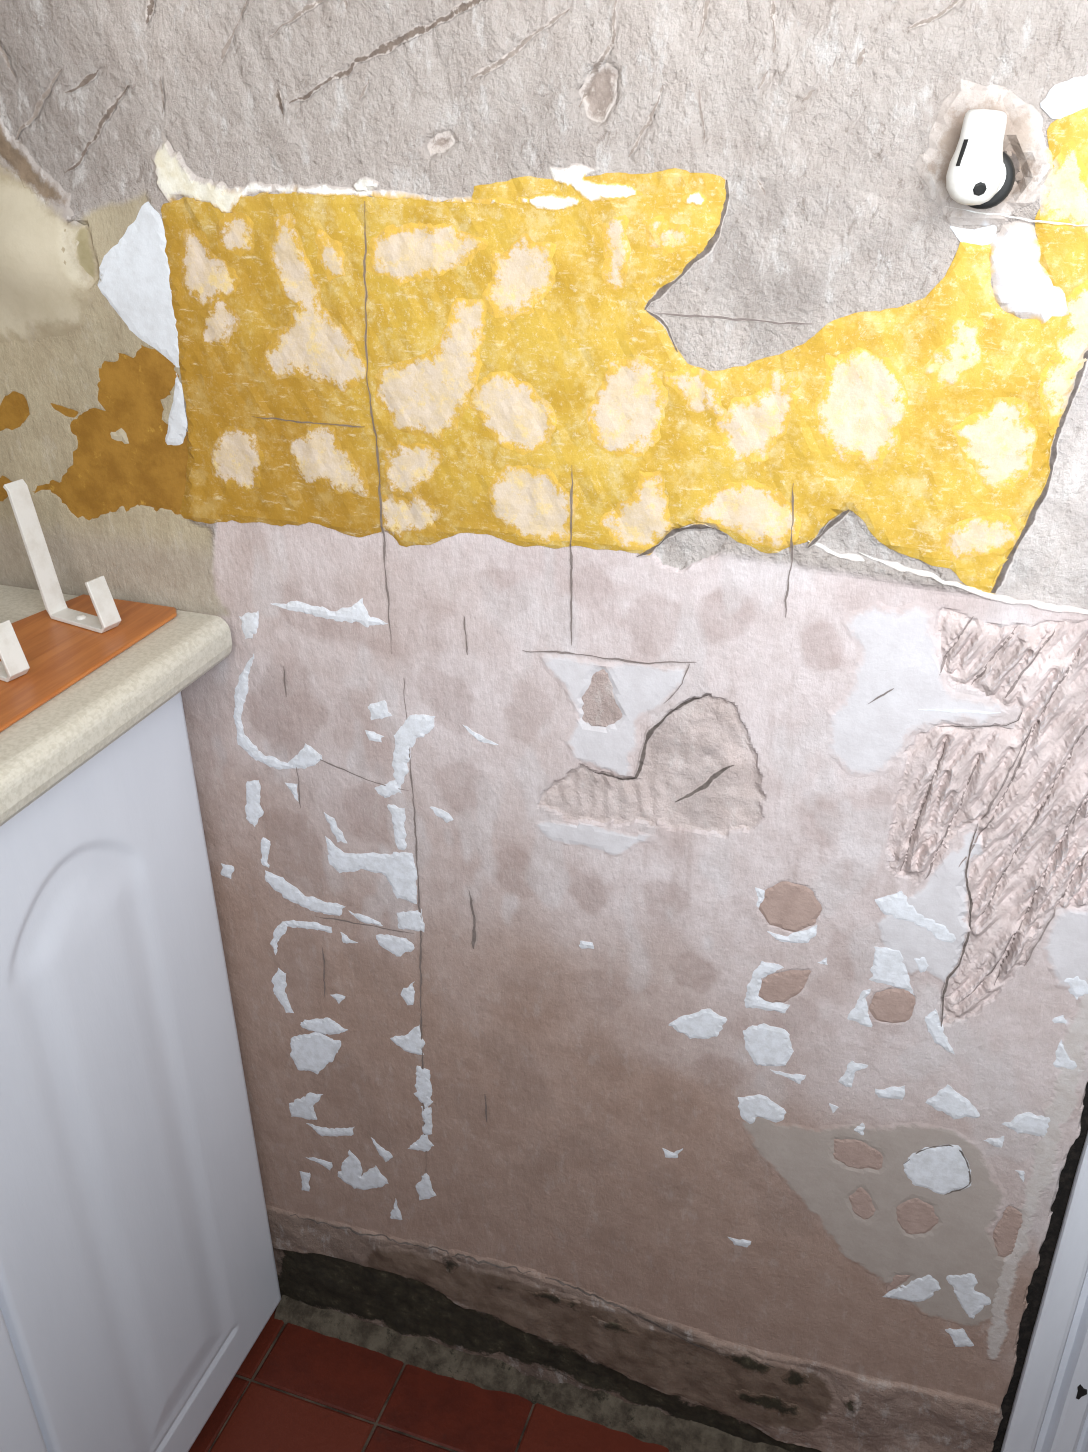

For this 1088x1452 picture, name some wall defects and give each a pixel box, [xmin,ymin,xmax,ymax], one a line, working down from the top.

peeling [0,391,30,431]
peeling [0,476,12,501]
peeling [32,74,1088,1087]
peeling [289,1025,436,1220]
peeling [738,1094,786,1124]
peeling [925,1084,980,1119]
peeling [984,1112,1051,1148]
peeling [896,1144,972,1234]
peeling [728,1237,751,1247]
spalling [993,1206,1023,1257]
peeling [883,1273,991,1347]
damp [276,1245,860,1452]